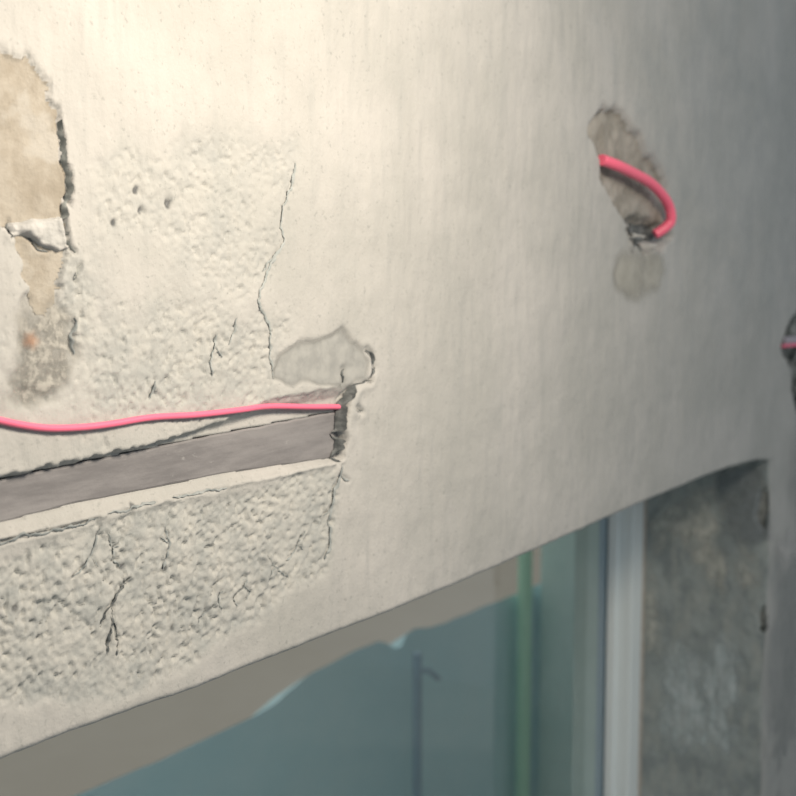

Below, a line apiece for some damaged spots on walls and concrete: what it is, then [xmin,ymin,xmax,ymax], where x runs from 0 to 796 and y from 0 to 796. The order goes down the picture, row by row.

flaking render [587,109,664,254]
flaking render [0,54,76,404]
crack [258,163,296,375]
crack [209,318,237,375]
flaking render [273,330,368,388]
flaking render [781,347,796,408]
flaking render [784,314,796,336]
crack [0,487,227,655]
peeling [760,606,768,633]